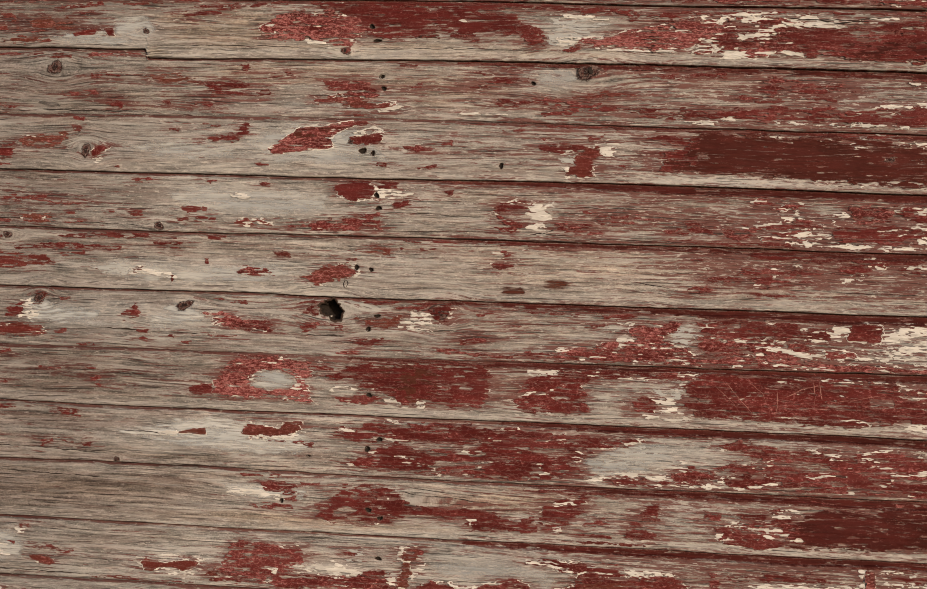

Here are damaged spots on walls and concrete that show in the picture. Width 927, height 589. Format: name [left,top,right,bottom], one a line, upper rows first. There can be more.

peeling [62,71,126,108]
peeling [123,0,927,299]
peeling [91,538,530,589]
peeling [188,298,927,589]